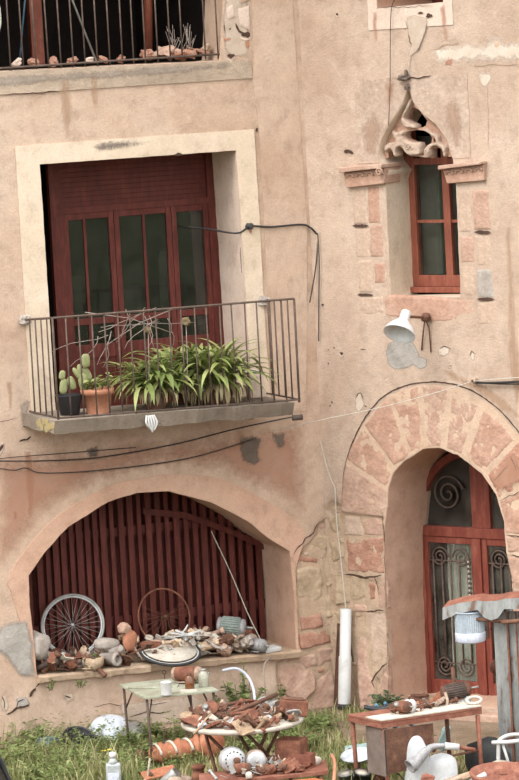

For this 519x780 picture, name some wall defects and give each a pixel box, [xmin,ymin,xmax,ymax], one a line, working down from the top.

flaking render [224,0,252,61]
flaking render [434,38,519,86]
flaking render [386,341,426,369]
flaking render [492,456,519,489]